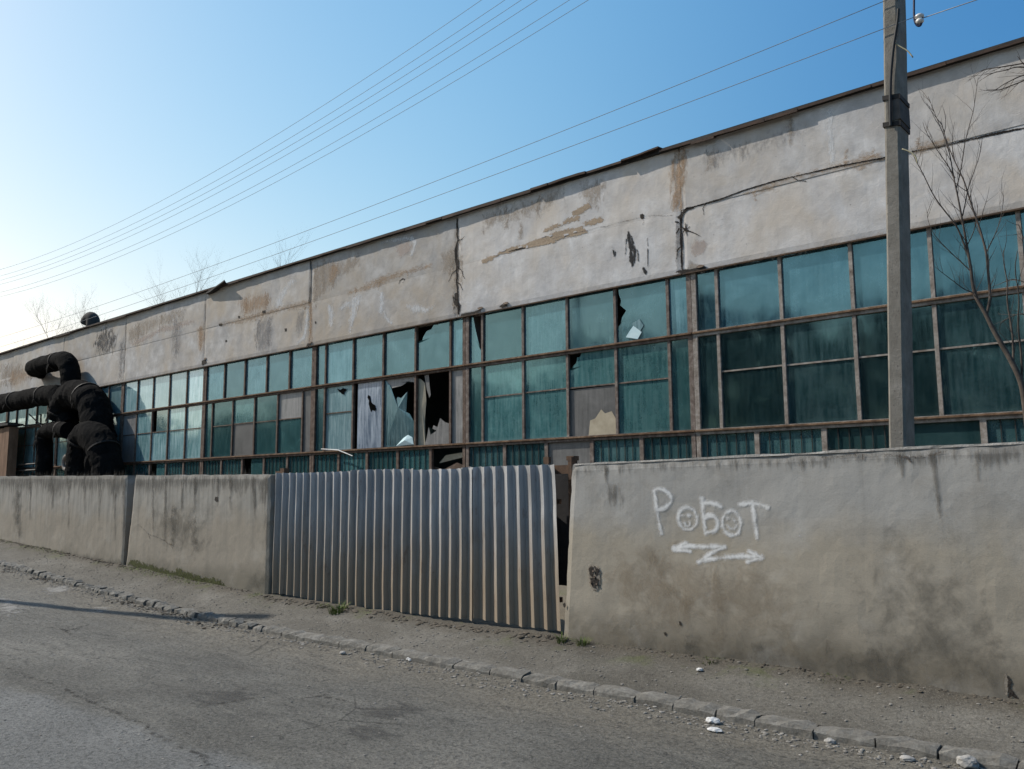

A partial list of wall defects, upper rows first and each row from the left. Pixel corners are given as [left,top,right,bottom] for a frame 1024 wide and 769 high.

crack [912,127,1024,152]
peeling [482,203,603,263]
crack [570,157,885,269]
crack [449,218,465,315]
spalling [588,564,601,591]